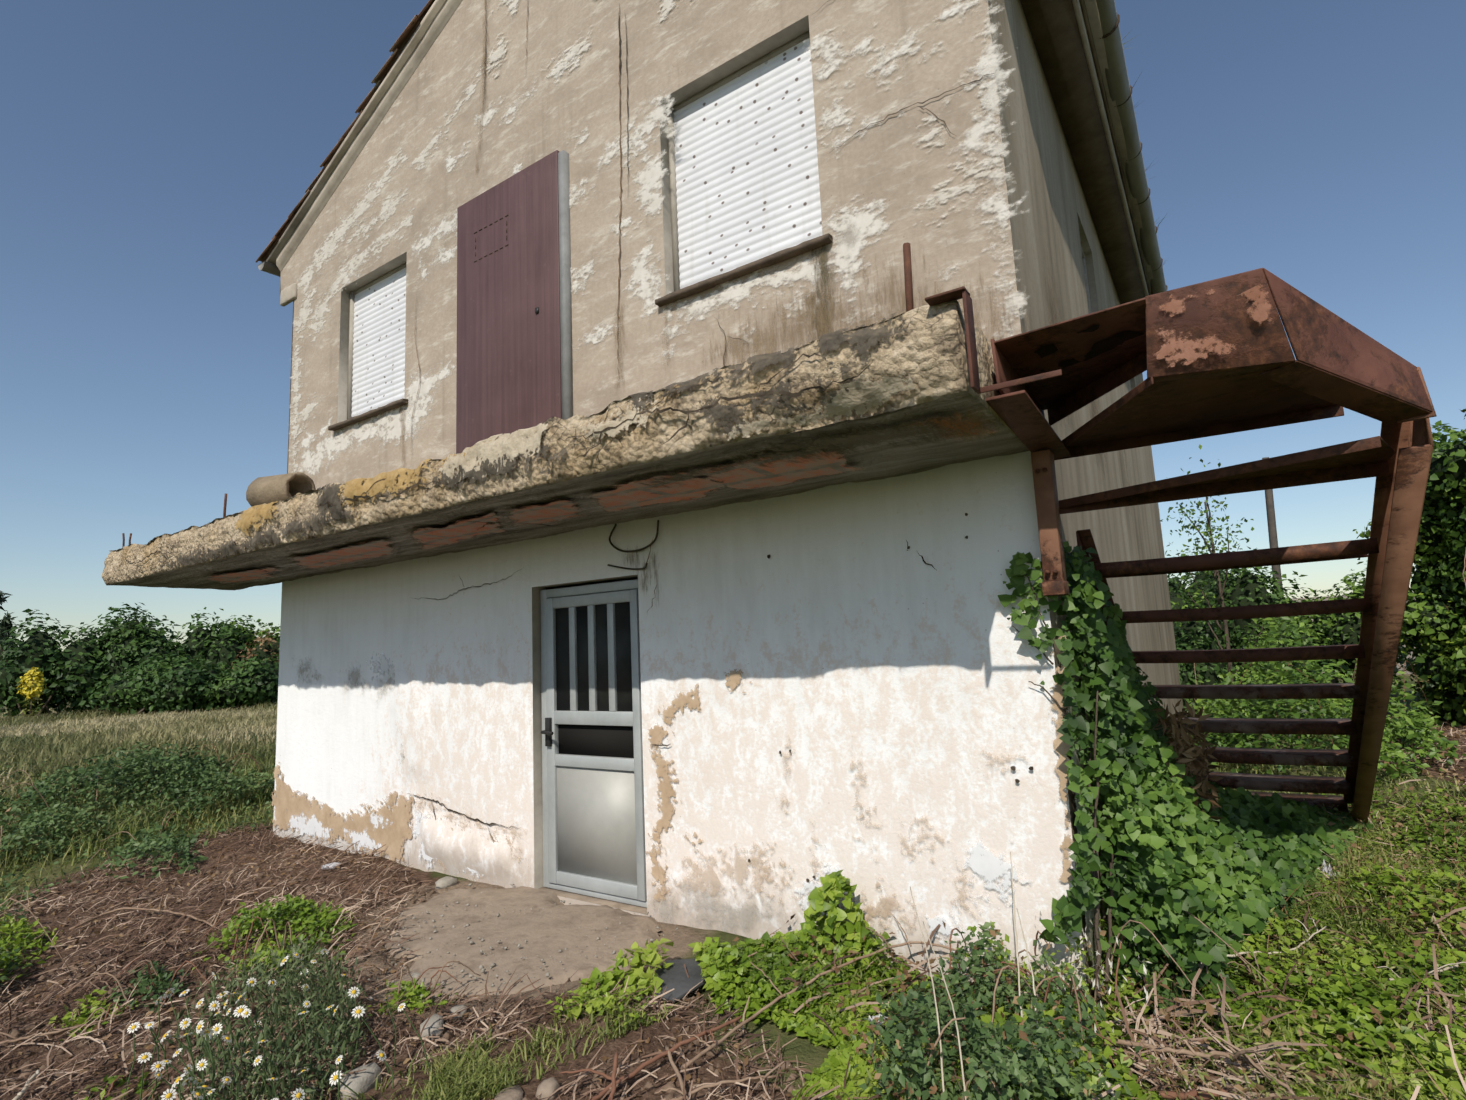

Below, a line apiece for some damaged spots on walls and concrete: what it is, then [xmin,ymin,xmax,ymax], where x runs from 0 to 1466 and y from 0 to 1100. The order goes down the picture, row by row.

peeling [289,25,594,484]
crack [480,0,488,105]
peeling [569,94,675,236]
crack [617,5,629,381]
peeling [625,198,889,355]
peeling [914,0,1021,238]
spalling [579,398,662,446]
flaking render [411,449,863,549]
crack [415,567,524,600]
peeling [271,762,521,869]
crack [408,793,521,843]
peeling [645,684,839,910]